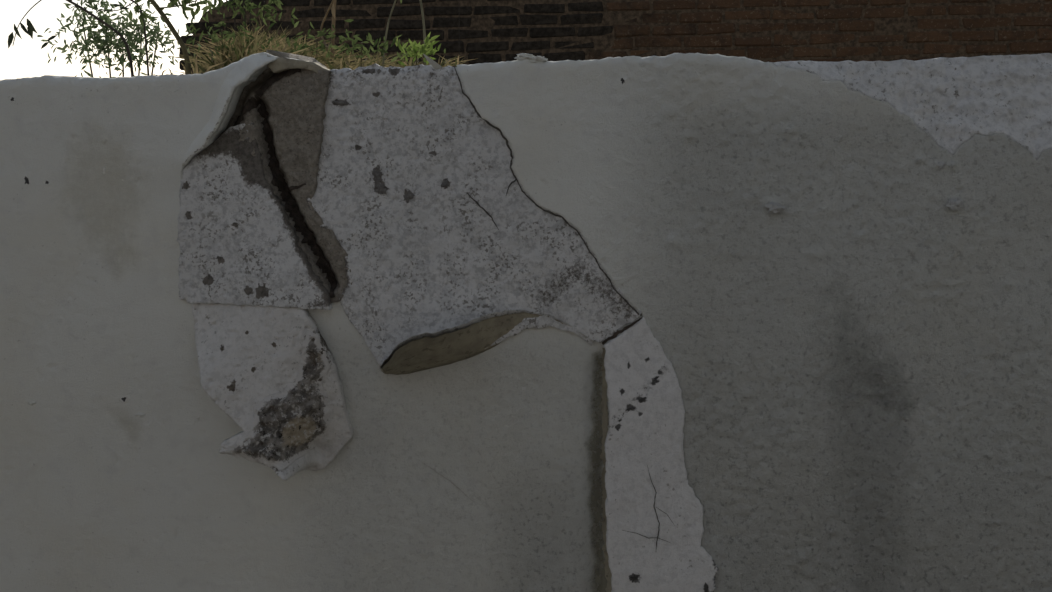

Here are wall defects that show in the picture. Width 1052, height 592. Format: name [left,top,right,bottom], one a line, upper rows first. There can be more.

peeling [177,49,354,481]
crack [233,69,337,298]
spalling [770,53,1052,161]
peeling [604,317,718,592]